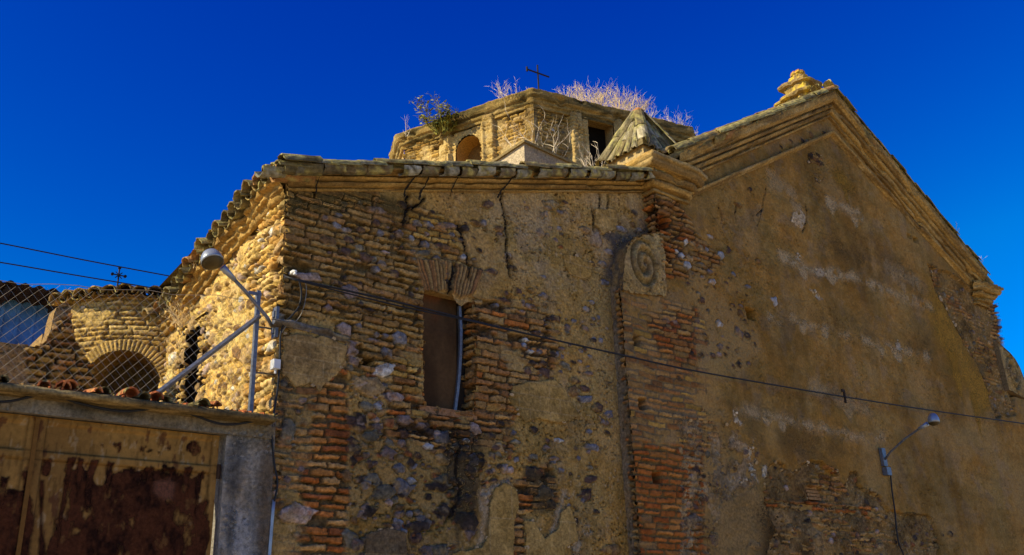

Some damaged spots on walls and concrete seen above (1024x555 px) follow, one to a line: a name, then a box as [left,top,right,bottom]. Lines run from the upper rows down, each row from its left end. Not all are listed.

crack [401,166,462,226]
crack [497,168,517,268]
spalling [928,264,1015,417]
rust [0,441,210,555]
crack [448,432,463,517]
spalling [676,409,939,555]